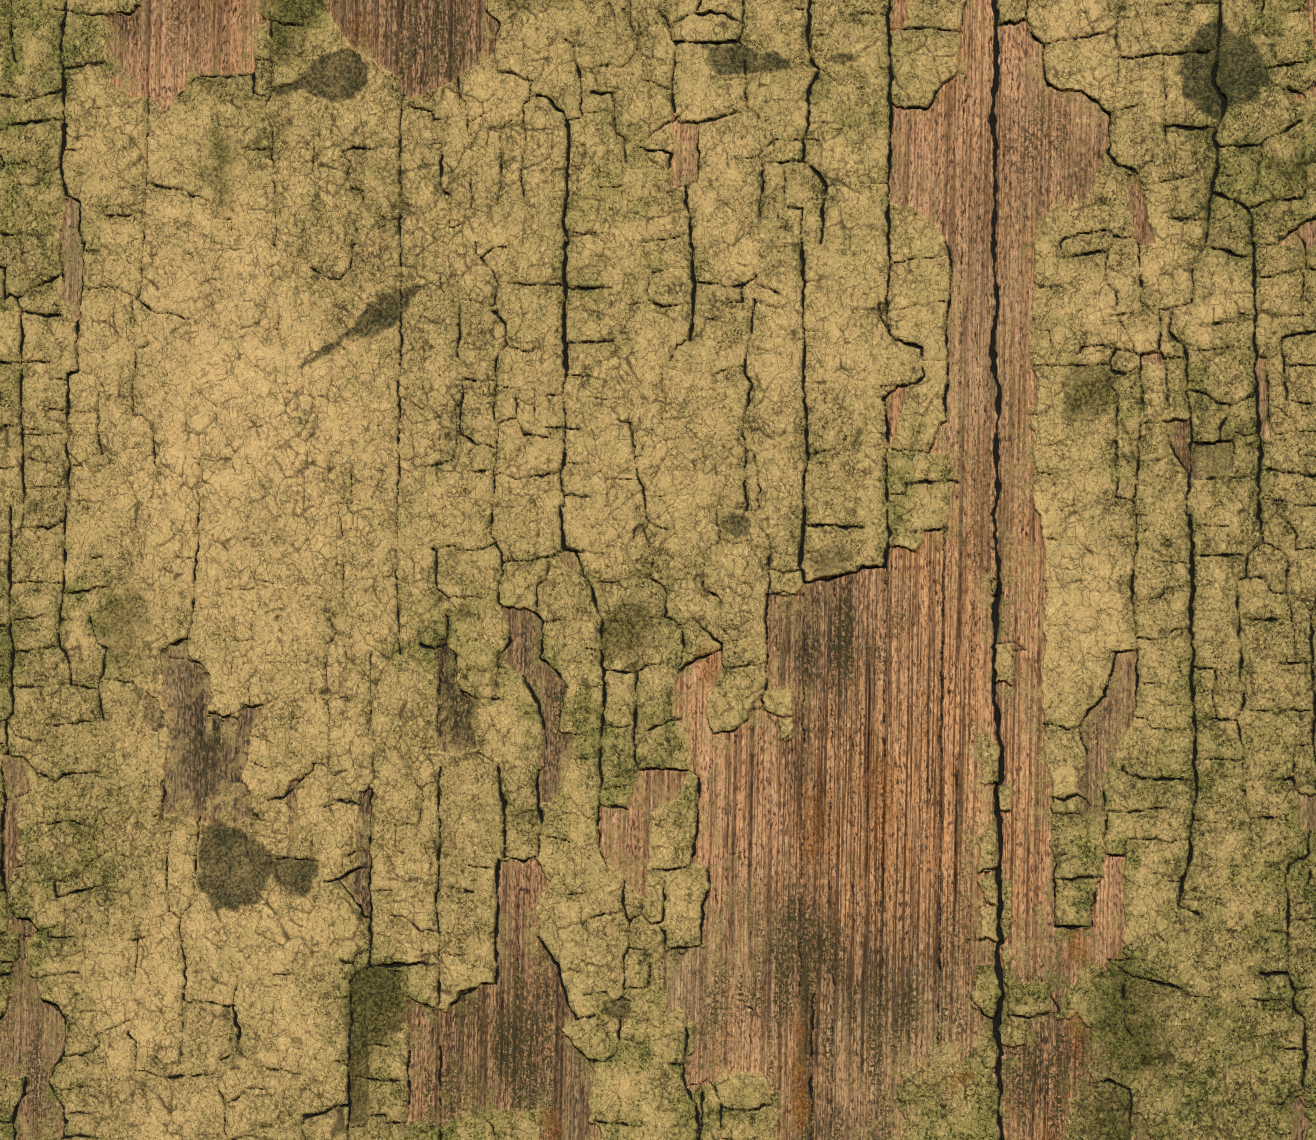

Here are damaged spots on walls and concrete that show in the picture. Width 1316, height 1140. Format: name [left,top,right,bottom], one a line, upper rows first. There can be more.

peeling [100,0,272,125]
water stain [276,49,367,102]
peeling [318,0,504,102]
water stain [1181,22,1270,118]
peeling [1276,212,1316,254]
water stain [301,284,426,368]
peeling [591,0,1160,1140]
crack [965,0,1316,1140]
peeling [138,633,266,829]
water stain [197,821,317,909]
peeling [0,749,70,1140]
peeling [343,853,607,1140]